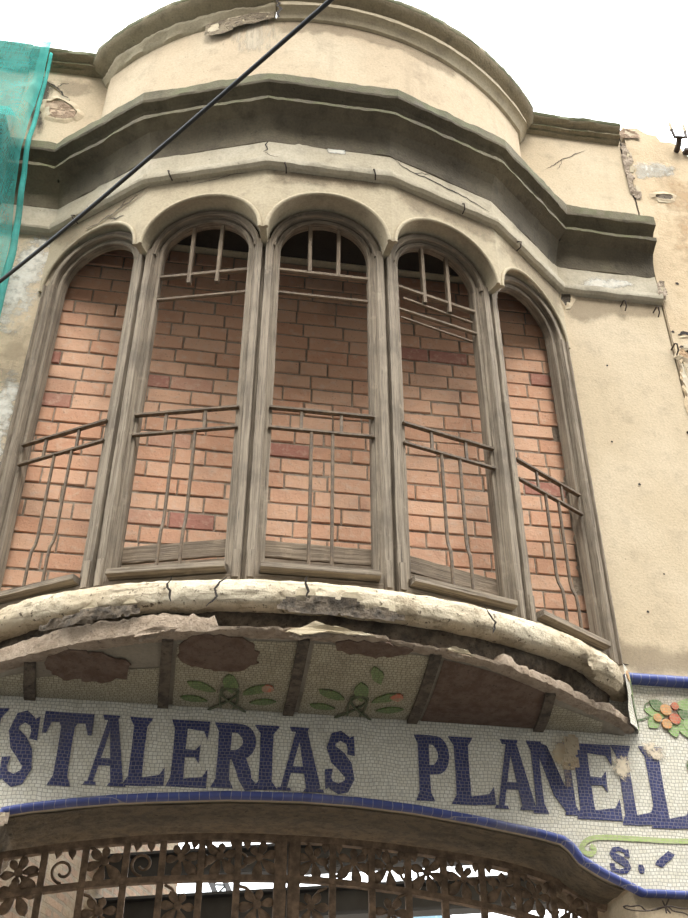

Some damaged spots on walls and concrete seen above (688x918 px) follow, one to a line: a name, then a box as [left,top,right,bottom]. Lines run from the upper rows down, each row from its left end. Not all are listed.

spalling [40,95,85,124]
spalling [619,129,677,204]
peeling [671,330,688,413]
spalling [0,588,635,734]
peeling [643,742,663,760]